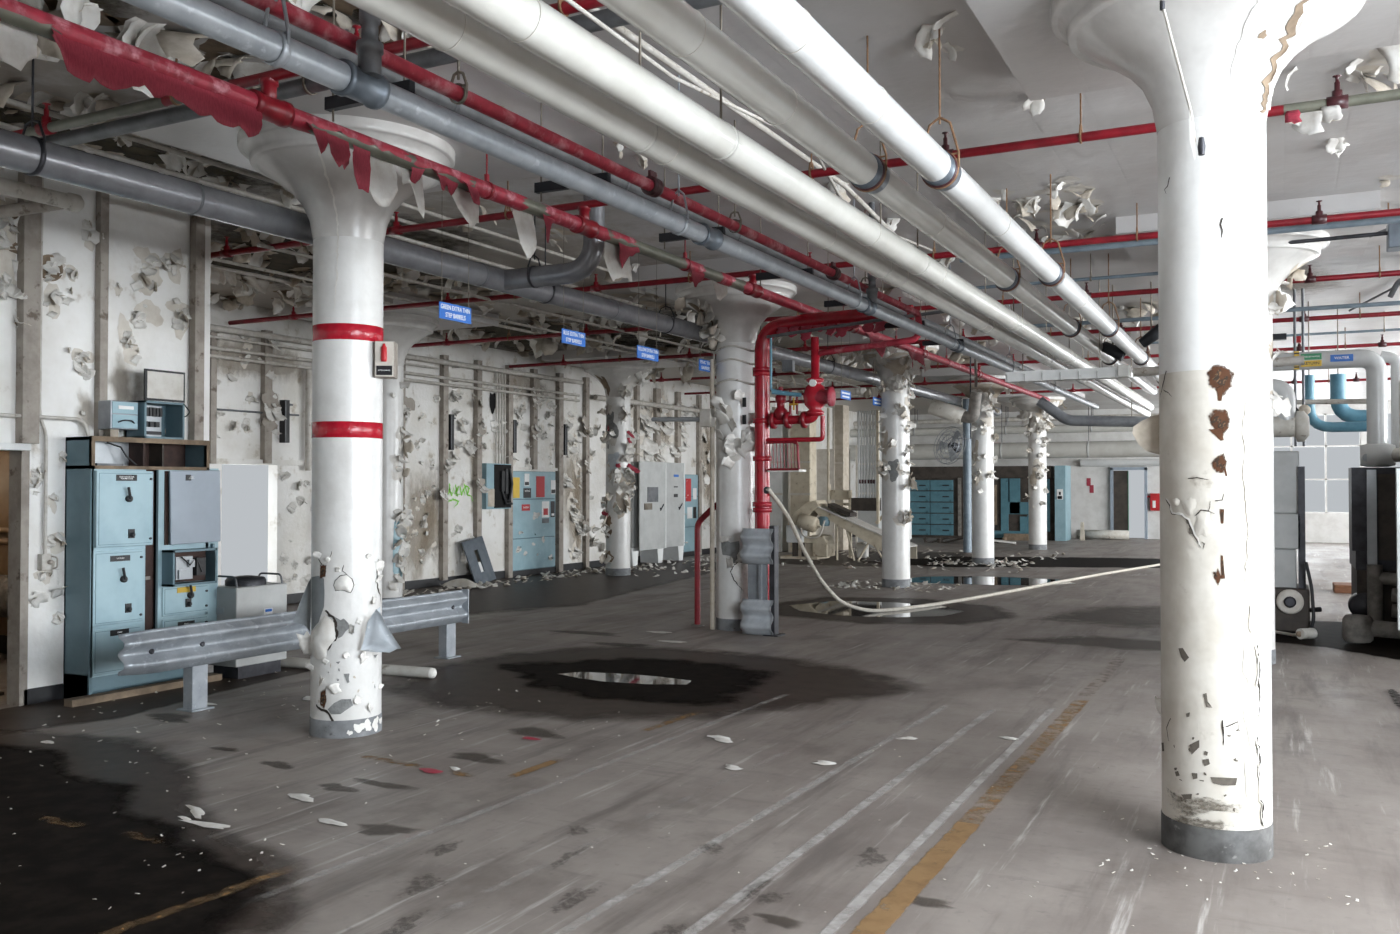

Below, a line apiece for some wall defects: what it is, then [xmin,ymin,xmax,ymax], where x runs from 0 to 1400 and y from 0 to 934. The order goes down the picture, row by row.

peeling [0,21,251,197]
peeling [16,0,276,90]
peeling [0,195,79,330]
peeling [977,176,1112,242]
peeling [366,241,772,604]
peeling [759,287,1067,508]
corrosion [1207,365,1235,476]
crack [1166,477,1224,548]
damp [208,667,310,695]
peeling [279,539,384,736]
damp [395,631,907,737]
damp [0,687,294,934]